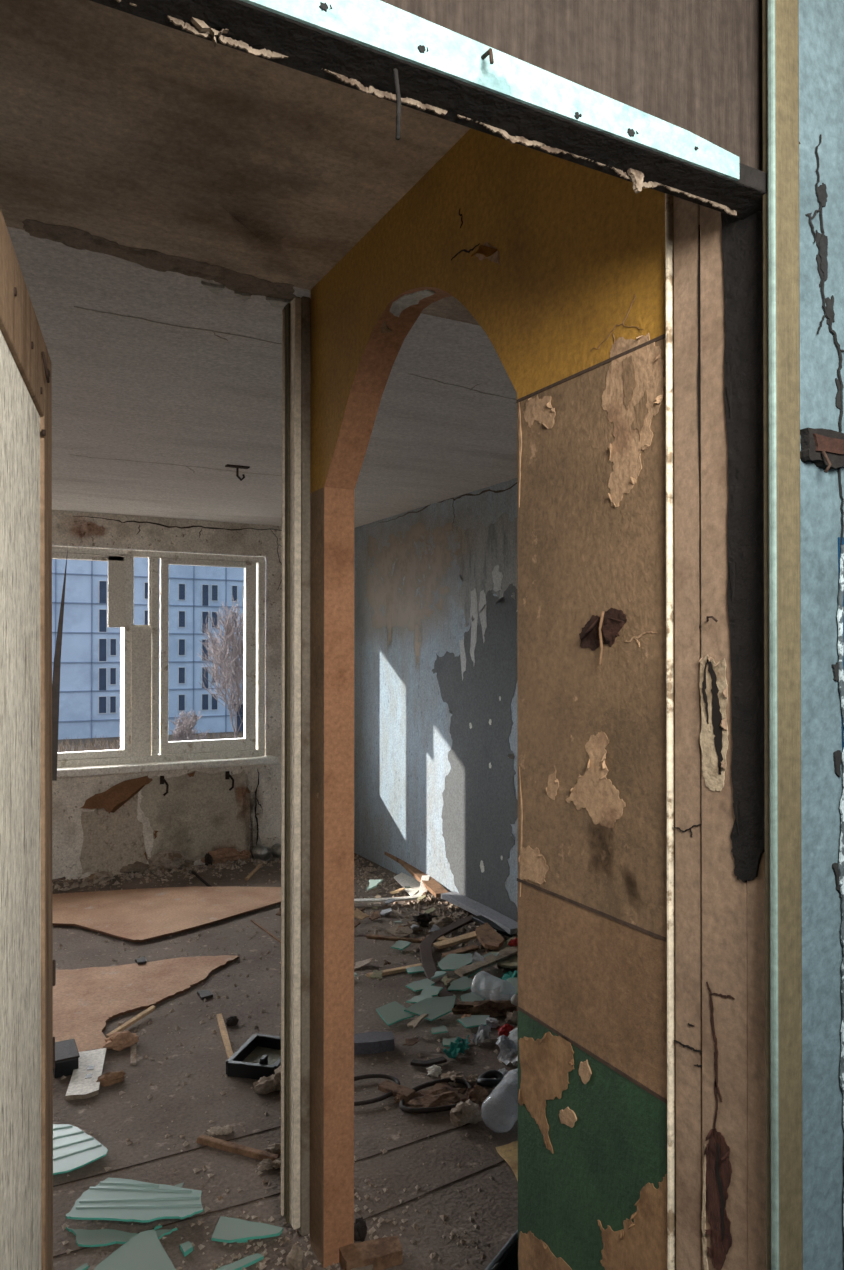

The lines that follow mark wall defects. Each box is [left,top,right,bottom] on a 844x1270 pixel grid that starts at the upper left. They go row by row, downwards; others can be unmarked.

crack [805,134,844,433]
peeling [602,333,666,507]
crack [836,467,844,550]
peeling [432,395,556,922]
peeling [545,731,626,828]
peeling [518,1032,592,1153]
crack [673,982,735,1128]
peeling [518,1231,572,1270]
peeling [597,1174,667,1270]